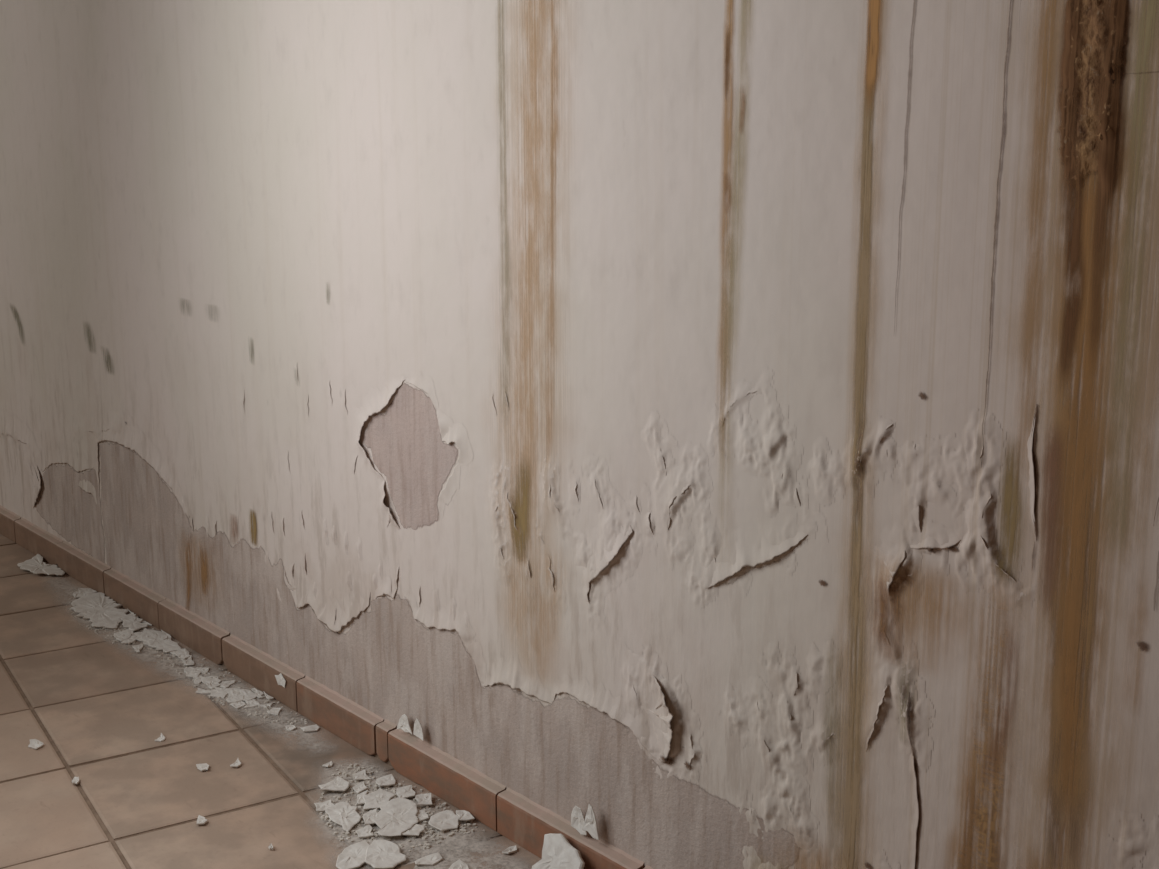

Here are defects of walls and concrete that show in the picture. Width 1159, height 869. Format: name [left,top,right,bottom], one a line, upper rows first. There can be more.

peeling [350,370,474,530]
peeling [27,420,800,869]
leakage [511,468,529,557]
peeling [679,509,829,609]
rust [829,0,881,869]
crack [906,693,920,869]